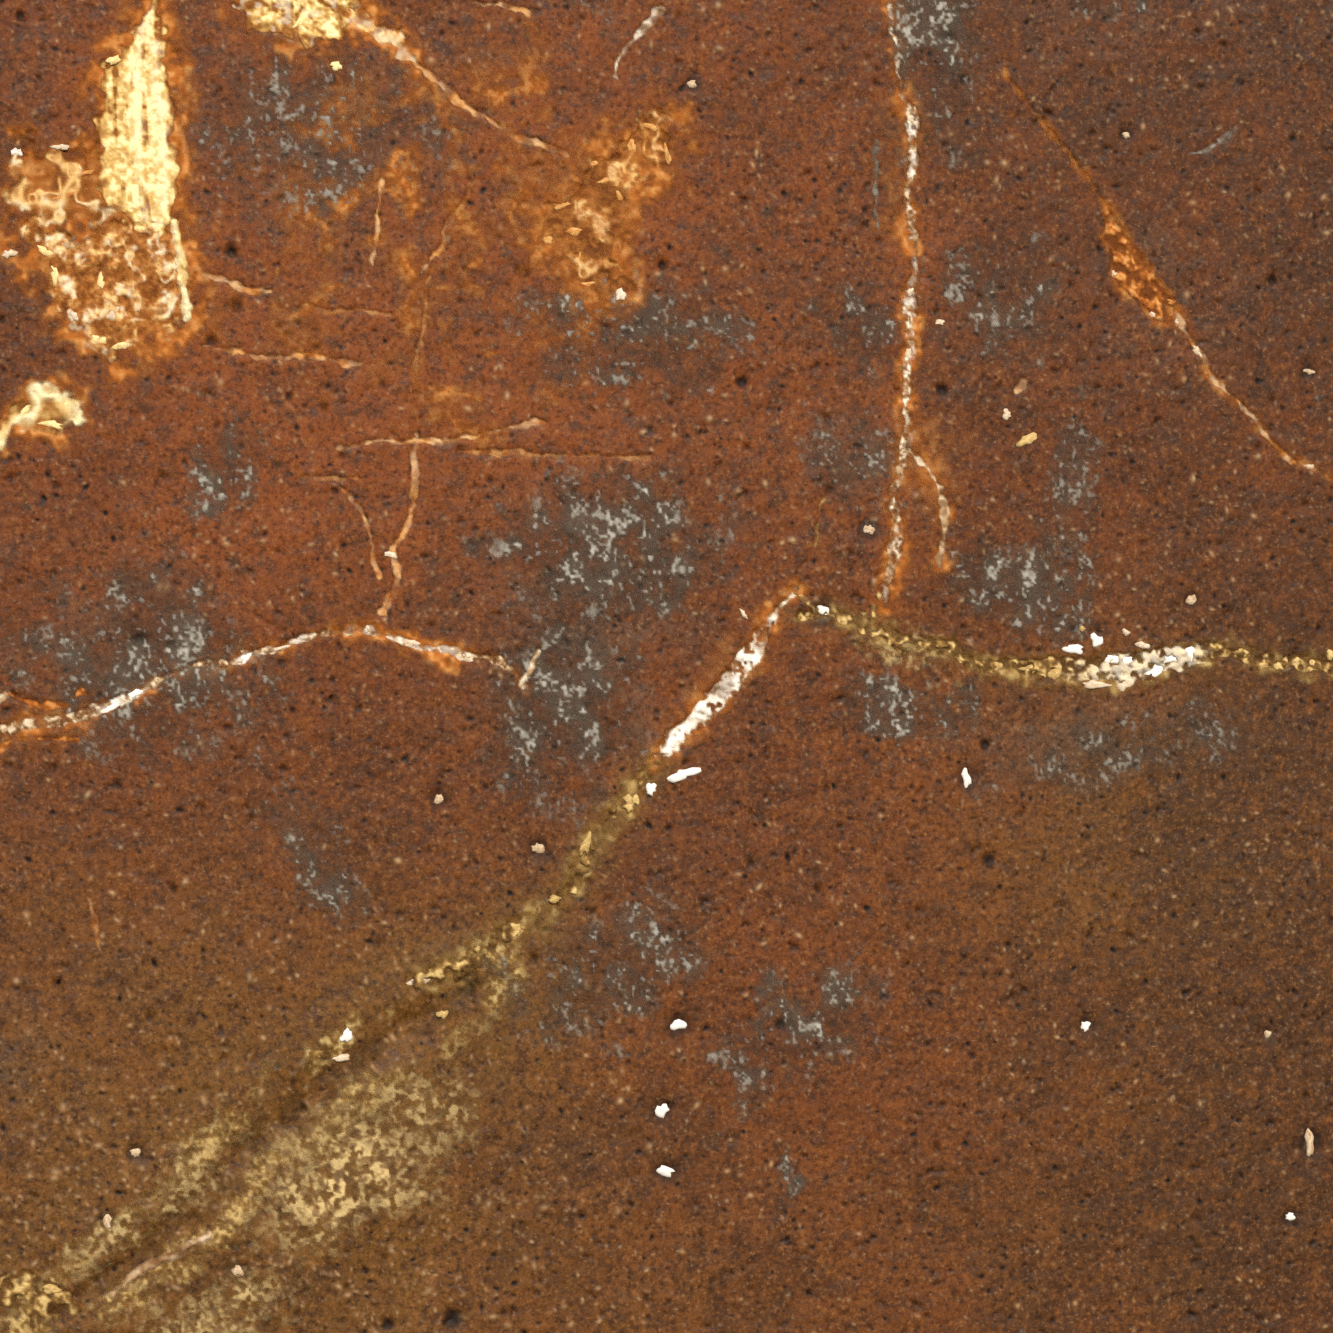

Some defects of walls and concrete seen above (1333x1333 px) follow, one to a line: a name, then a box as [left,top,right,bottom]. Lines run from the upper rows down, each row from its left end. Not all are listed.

peeling [219,0,422,79]
rust [473,61,548,105]
peeling [0,0,215,382]
rust [299,192,359,244]
rust [373,148,419,219]
rust [507,180,566,260]
peeling [0,373,92,457]
crack [406,0,1333,1035]
crack [0,620,540,753]
water stain [858,672,922,738]
water stain [571,906,699,1014]
crack [0,1016,400,1333]